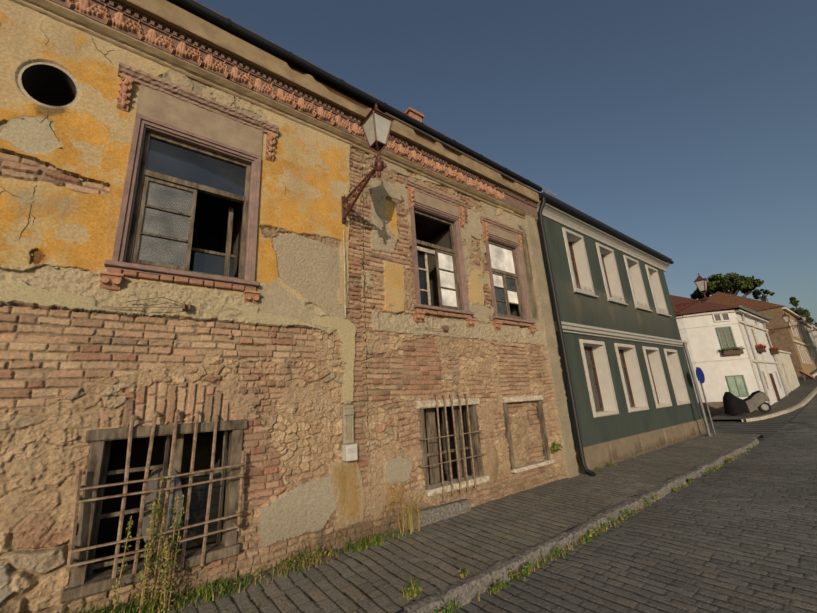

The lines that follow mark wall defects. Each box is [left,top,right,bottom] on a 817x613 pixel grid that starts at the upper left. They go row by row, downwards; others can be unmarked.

spalling [0,115,111,195]
spalling [0,146,369,488]
spalling [401,335,443,400]
peeling [385,456,413,488]
peeling [258,475,339,548]